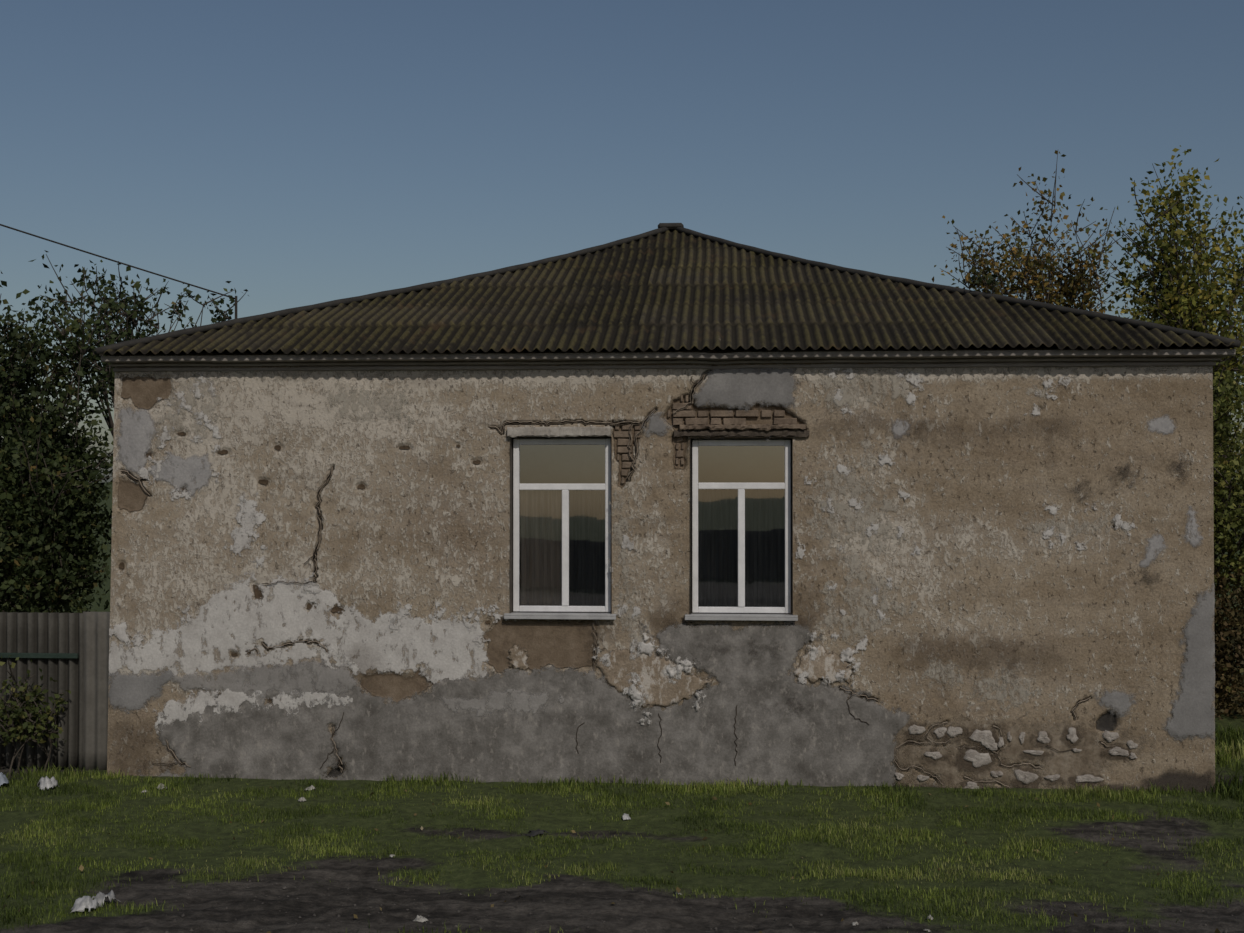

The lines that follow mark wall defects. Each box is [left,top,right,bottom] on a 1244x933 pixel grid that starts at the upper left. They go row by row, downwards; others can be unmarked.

spalling [118,371,313,512]
crack [262,466,334,585]
peeling [109,479,607,734]
flaking render [608,422,648,644]
flaking render [663,395,806,469]
peeling [794,439,924,685]